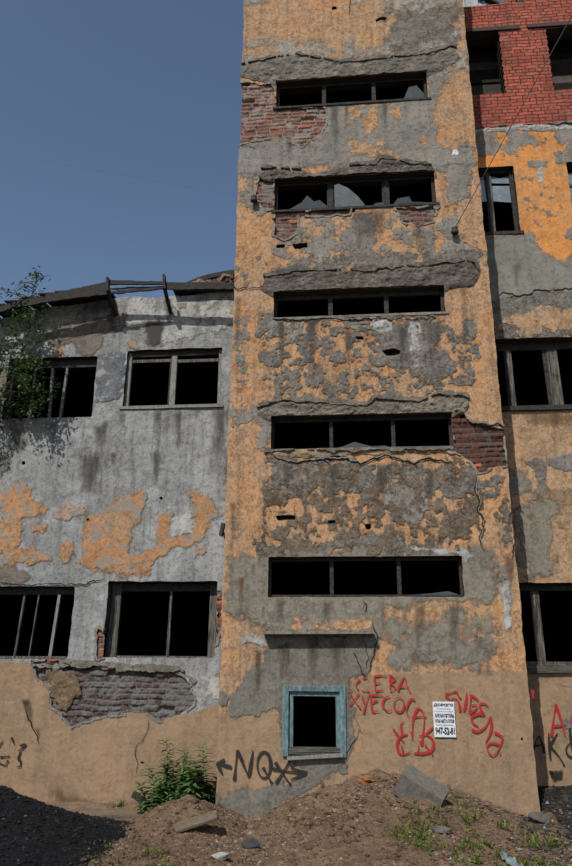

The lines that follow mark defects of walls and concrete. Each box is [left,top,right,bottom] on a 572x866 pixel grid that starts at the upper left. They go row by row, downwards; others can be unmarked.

peeling [238,0,572,339]
crack [498,287,572,298]
crack [270,453,452,468]
peeling [0,291,572,816]
crack [353,601,381,677]